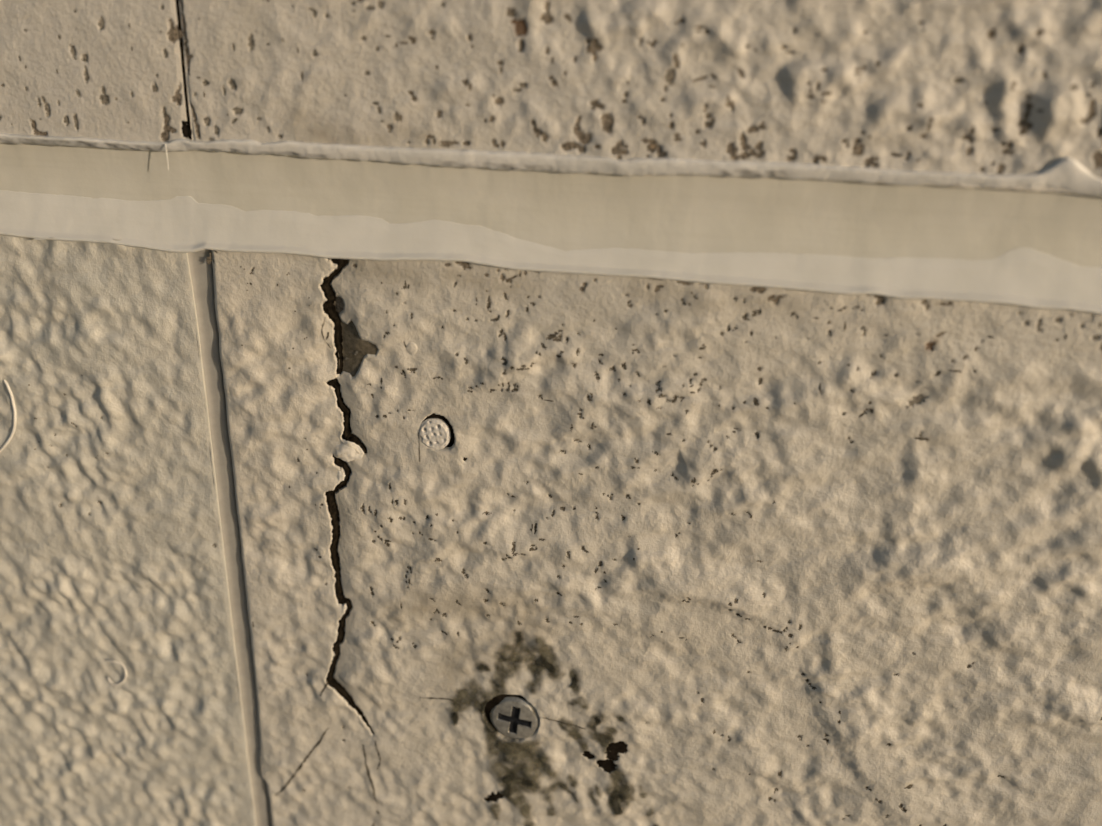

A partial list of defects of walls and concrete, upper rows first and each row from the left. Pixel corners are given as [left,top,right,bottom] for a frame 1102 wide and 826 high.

peeling [334,296,395,377]
crack [320,258,381,826]
crack [276,729,328,795]
damp [451,632,646,826]